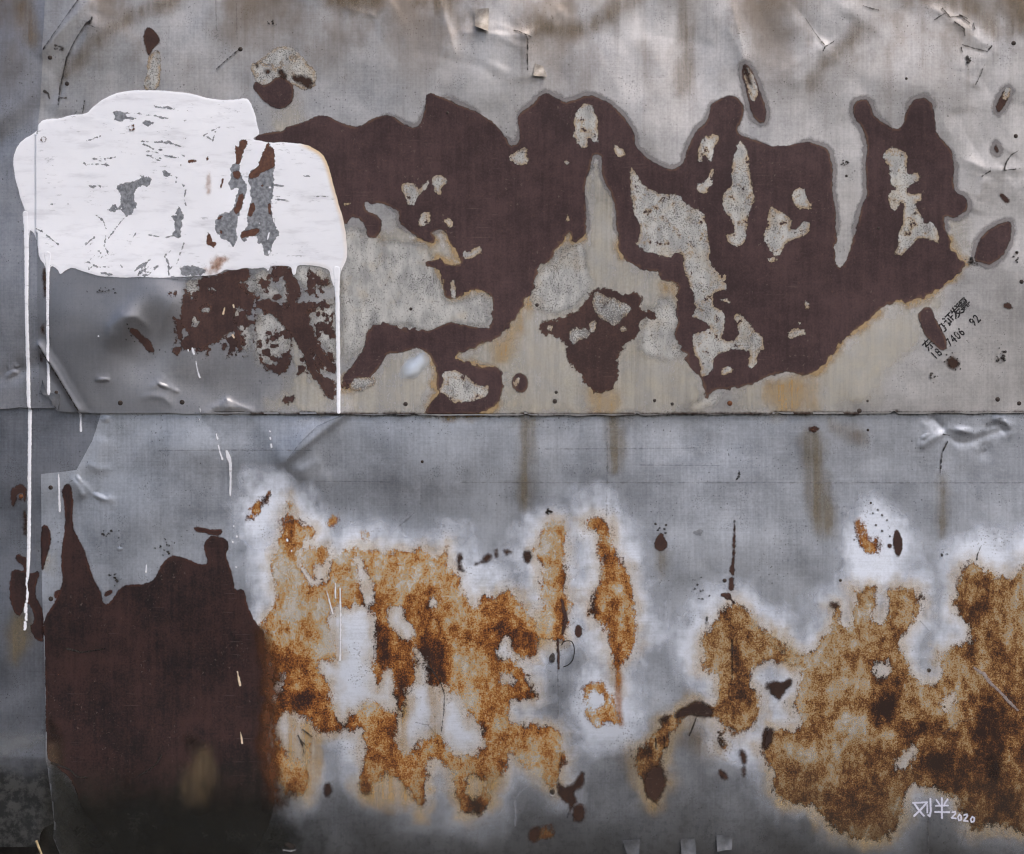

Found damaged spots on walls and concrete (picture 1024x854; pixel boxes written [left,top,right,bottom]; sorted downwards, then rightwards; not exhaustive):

peeling [206,140,285,256]
rust [9,484,638,828]
rust [630,520,1024,843]
rust [854,509,903,556]